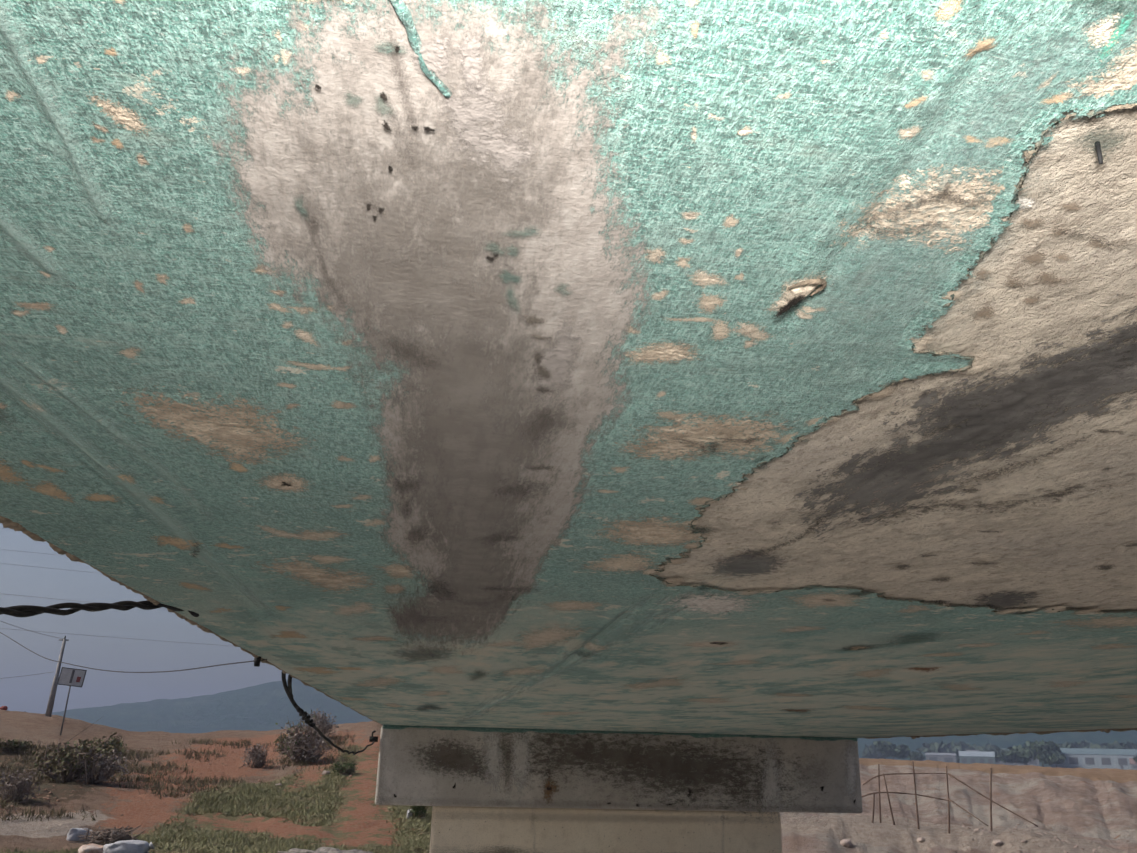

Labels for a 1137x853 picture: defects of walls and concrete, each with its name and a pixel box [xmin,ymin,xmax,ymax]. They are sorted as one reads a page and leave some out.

peeling [265,290,341,348]
leakage [288,56,575,648]
spalling [581,6,1137,629]
peeling [0,458,121,503]
peeling [103,374,317,493]
leakage [410,731,801,820]